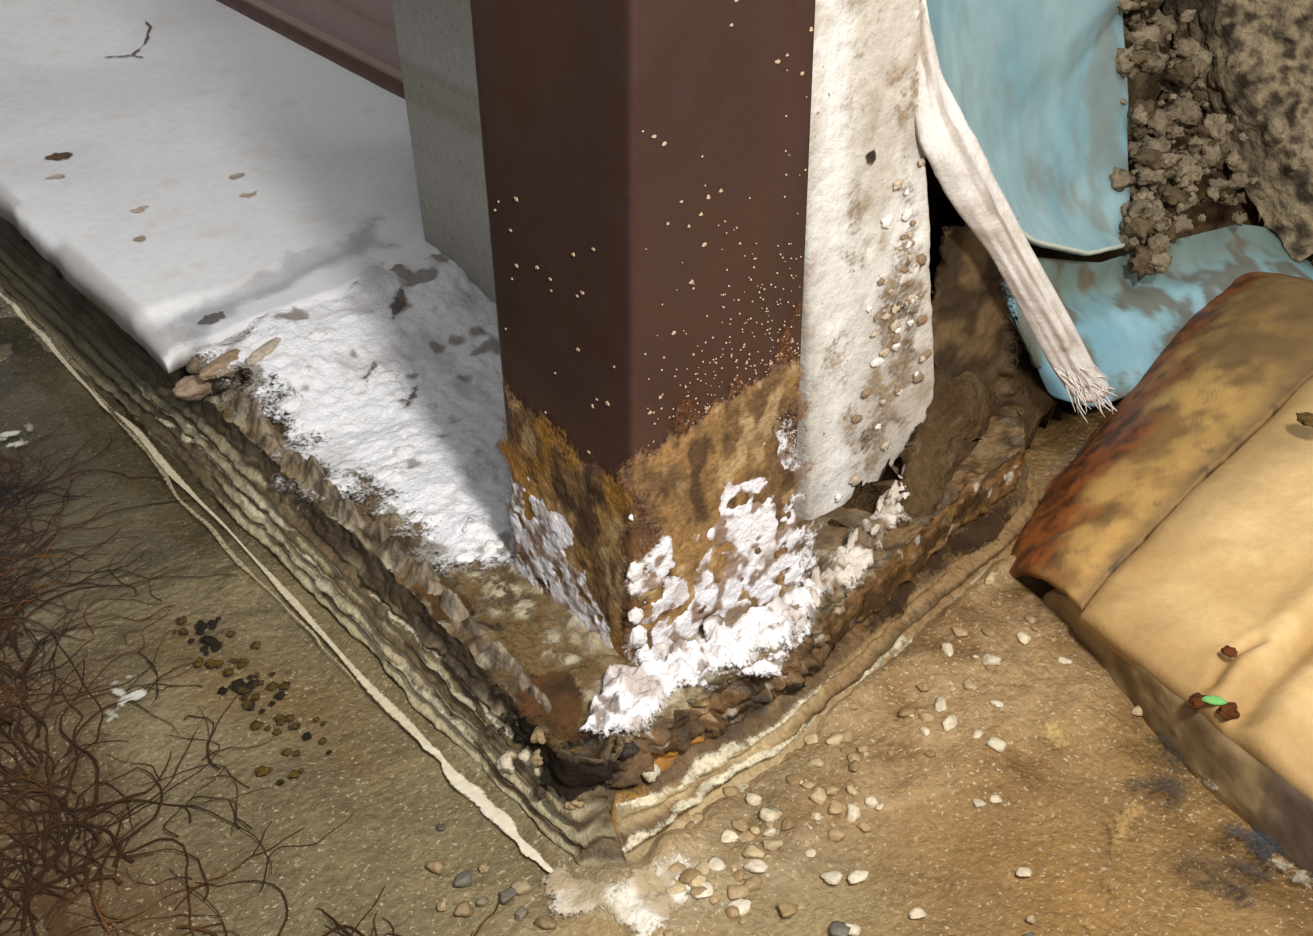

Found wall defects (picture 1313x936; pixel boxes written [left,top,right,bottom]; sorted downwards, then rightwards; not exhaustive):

damp [892,66,919,126]
damp [0,292,695,936]
spalling [485,685,640,810]
damp [140,215,1024,852]
spalling [642,764,661,783]
corrosion [494,302,818,661]